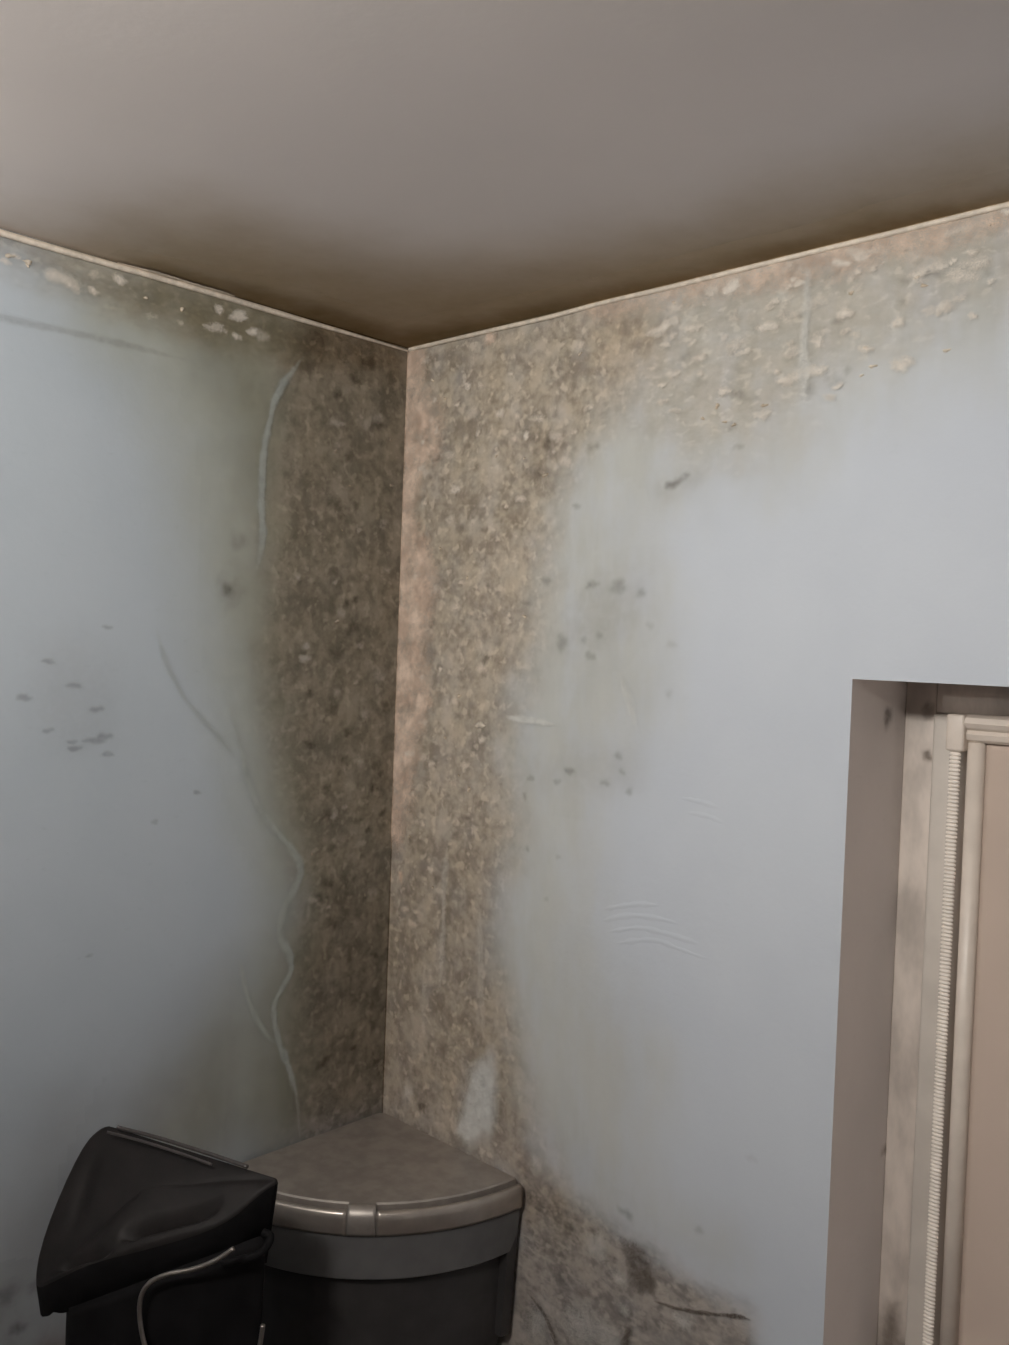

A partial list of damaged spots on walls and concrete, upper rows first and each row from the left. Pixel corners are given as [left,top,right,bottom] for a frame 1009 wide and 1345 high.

water stain [564,206,1009,412]
water stain [421,359,578,477]
water stain [526,1230,745,1345]